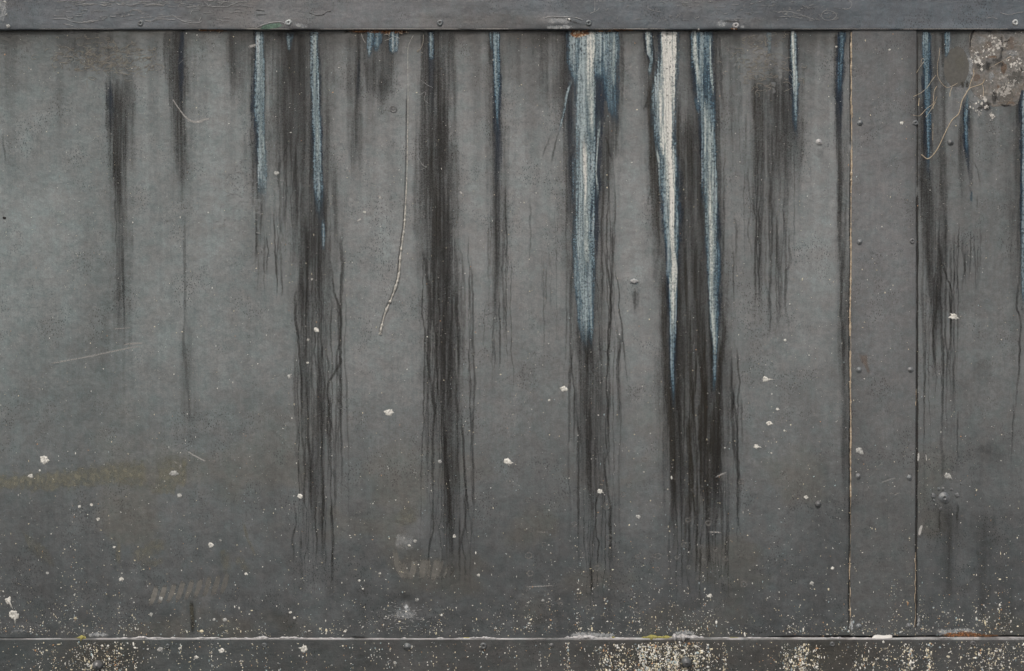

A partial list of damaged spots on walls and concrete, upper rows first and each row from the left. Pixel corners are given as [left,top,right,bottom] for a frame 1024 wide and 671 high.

leakage [250,32,267,190]
leakage [284,31,336,284]
leakage [420,32,459,417]
leakage [488,32,502,257]
leakage [559,31,624,385]
leakage [644,31,738,537]
leakage [753,31,800,155]
leakage [918,31,955,332]
peeling [944,30,1024,121]